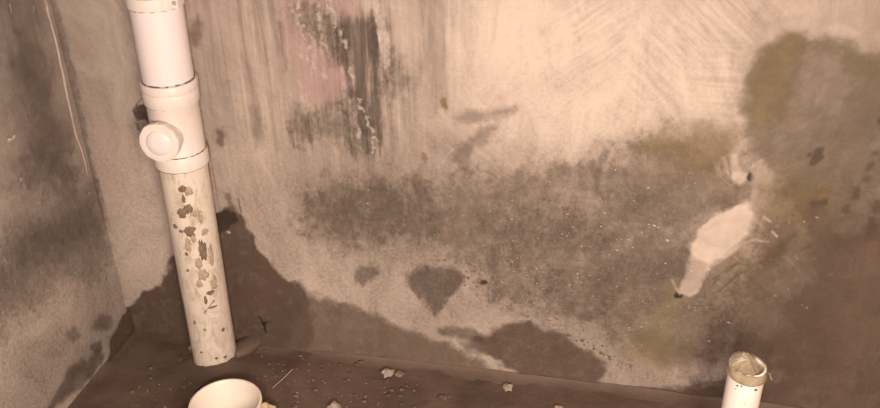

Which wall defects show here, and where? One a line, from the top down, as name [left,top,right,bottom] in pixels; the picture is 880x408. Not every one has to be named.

leakage [335,0,390,153]
leakage [51,256,189,408]
leakage [216,207,604,383]
leakage [662,383,725,398]
flaking render [674,201,754,298]
leakage [728,32,880,408]